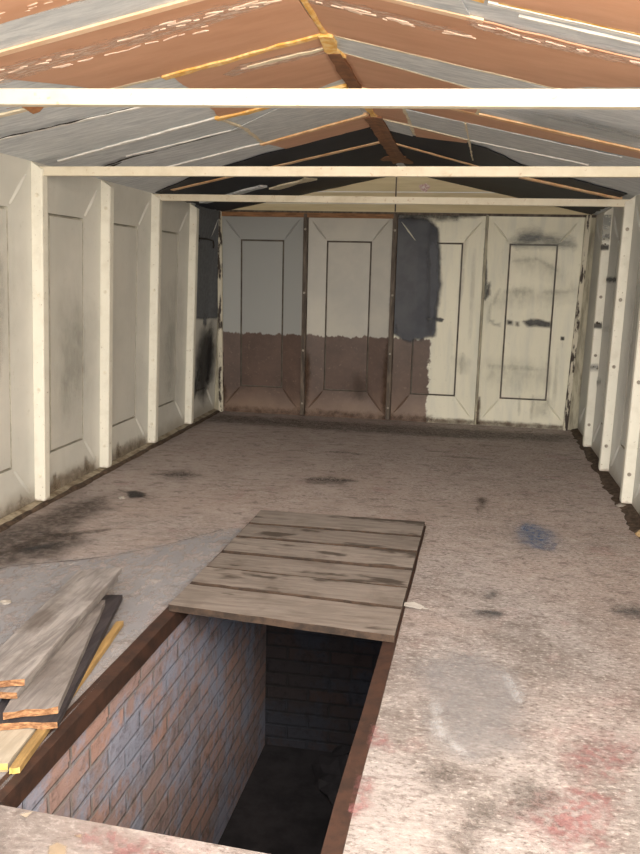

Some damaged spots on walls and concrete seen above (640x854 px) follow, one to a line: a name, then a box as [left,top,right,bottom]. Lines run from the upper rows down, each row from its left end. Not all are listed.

peeling [0,0,282,84]